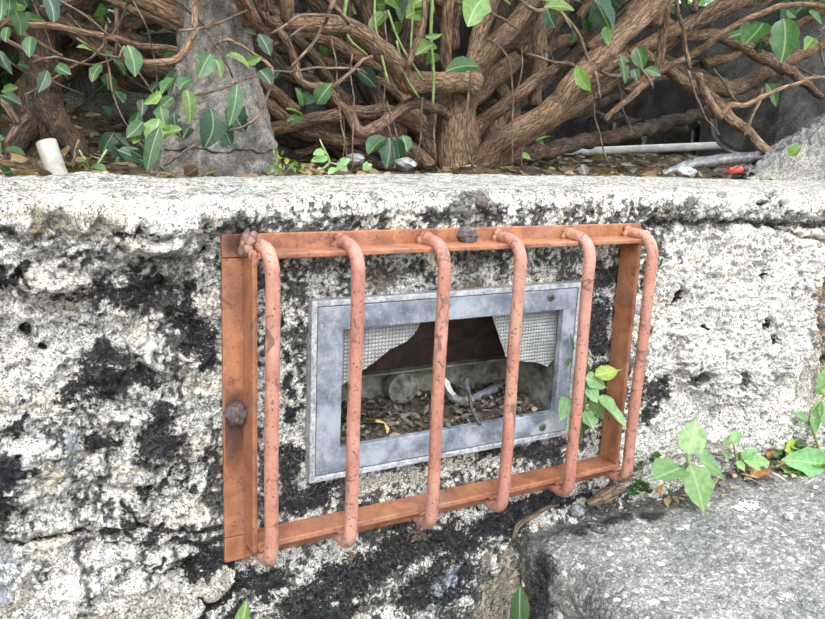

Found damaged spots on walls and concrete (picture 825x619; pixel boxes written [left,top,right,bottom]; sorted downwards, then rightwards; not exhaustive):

damp [30,206,105,242]
damp [109,222,162,241]
damp [0,264,9,291]
damp [16,264,160,312]
damp [155,283,220,373]
corrosion [811,278,825,372]
damp [0,398,30,441]
damp [51,335,587,619]
damp [0,450,40,604]